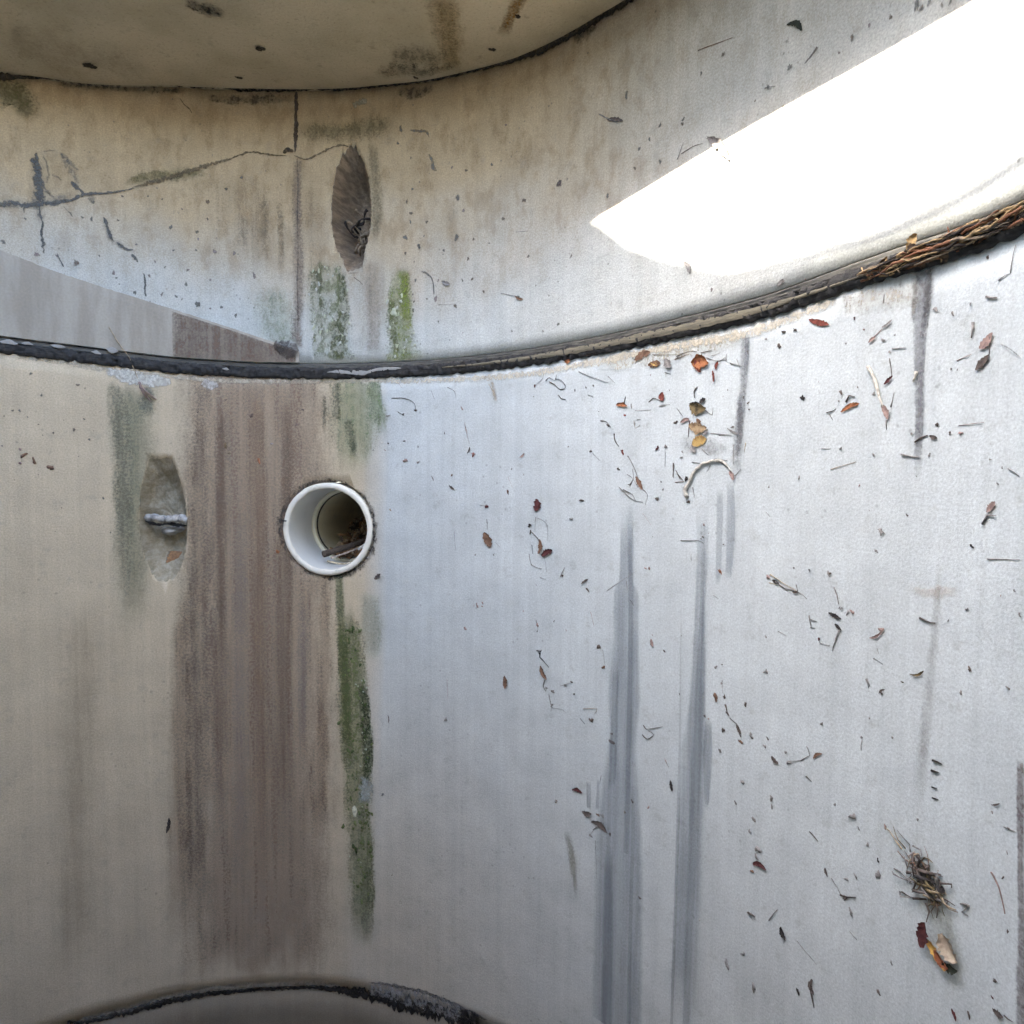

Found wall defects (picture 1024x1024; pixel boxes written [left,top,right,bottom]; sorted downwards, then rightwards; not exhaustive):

crack [0,0,634,296]
water stain [912,268,932,445]
water stain [21,300,830,959]